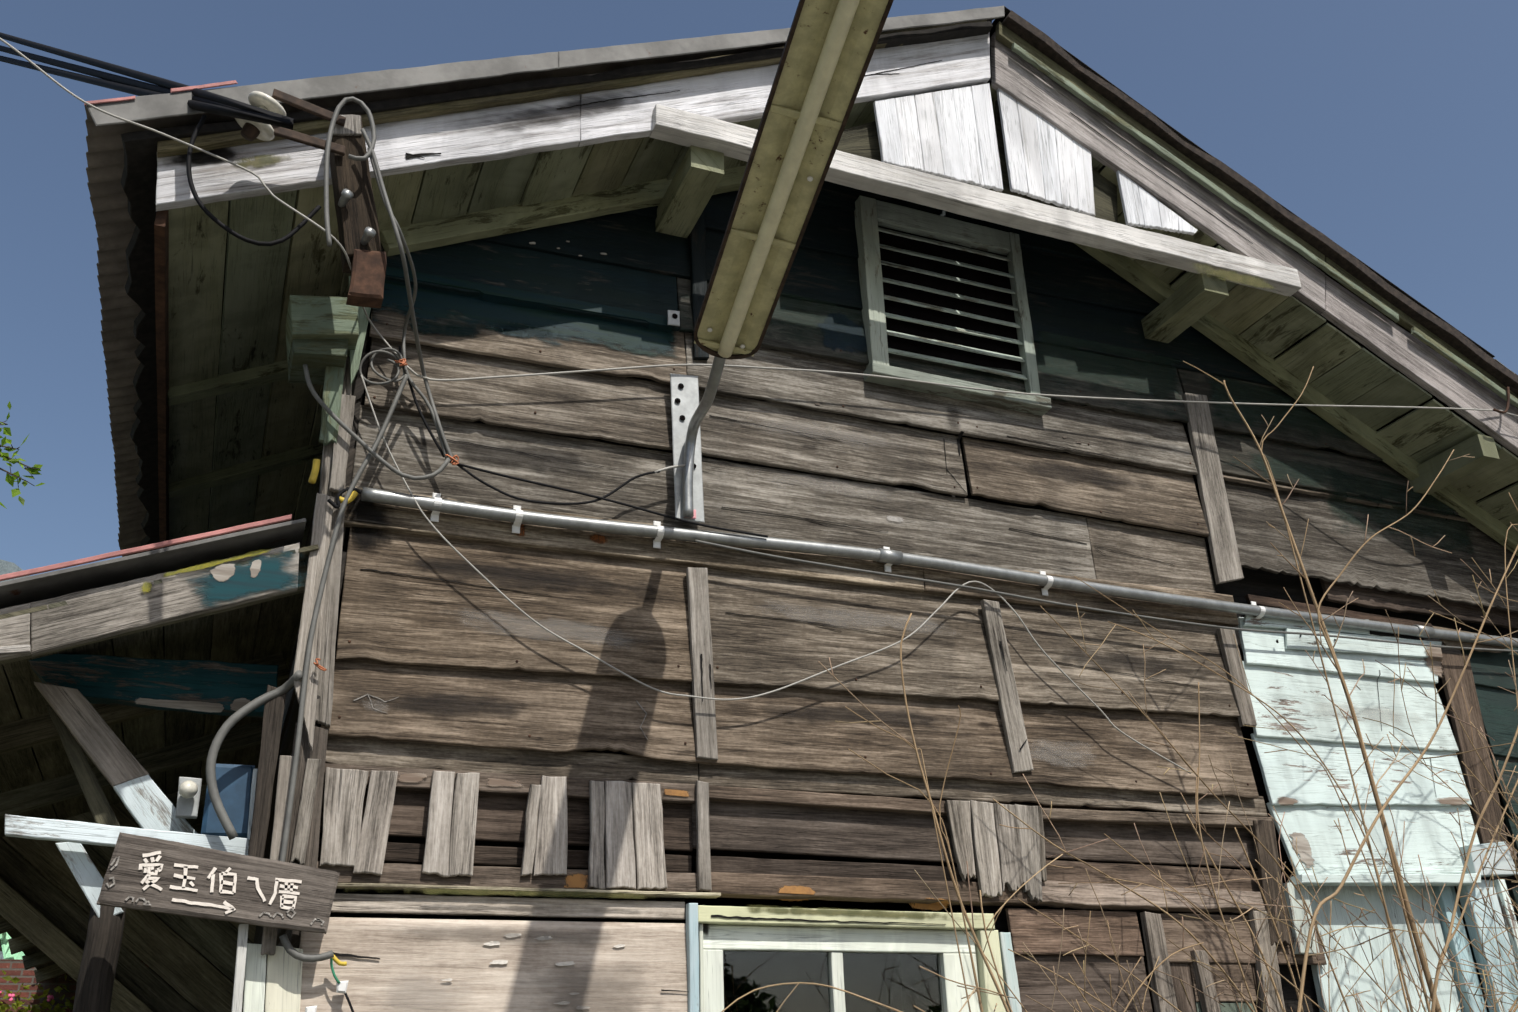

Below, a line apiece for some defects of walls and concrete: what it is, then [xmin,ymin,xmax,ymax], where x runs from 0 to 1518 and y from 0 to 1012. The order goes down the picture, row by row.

peeling [190,551,299,606]
peeling [1425,644,1444,679]
peeling [1278,797,1299,806]
peeling [1436,797,1470,806]
peeling [1289,832,1315,868]